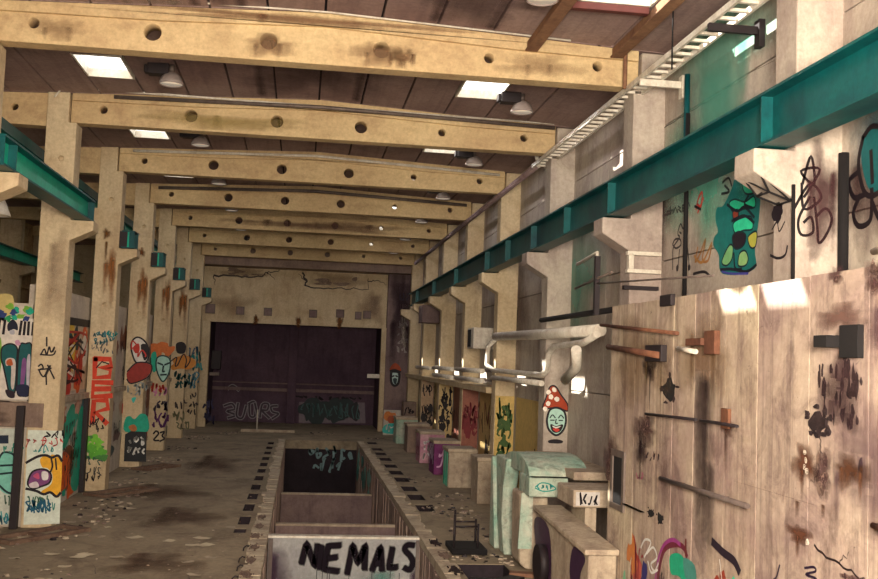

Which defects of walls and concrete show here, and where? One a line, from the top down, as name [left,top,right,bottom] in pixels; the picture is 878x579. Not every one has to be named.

leakage [255,38,281,52]
leakage [366,48,413,64]
corrosion [104,229,115,290]
corrosion [138,271,147,303]
corrosion [162,285,187,311]
crack [213,270,385,290]
crack [814,544,865,579]